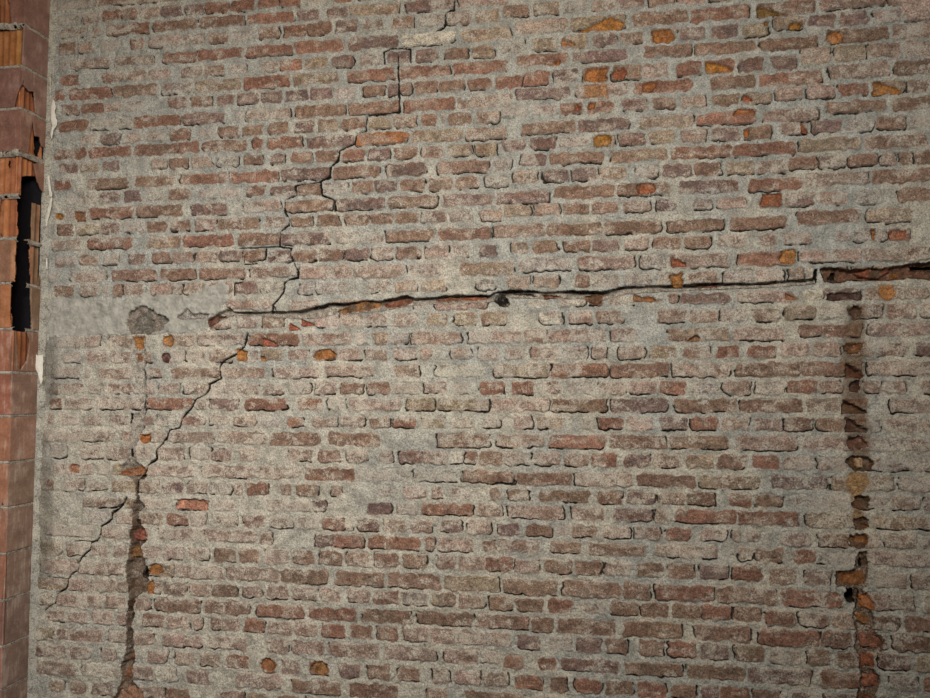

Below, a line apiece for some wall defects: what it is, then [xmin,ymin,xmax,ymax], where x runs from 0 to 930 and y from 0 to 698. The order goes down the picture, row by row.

peeling [49,72,57,139]
crack [234,1,455,315]
crack [44,333,249,624]
spalling [127,306,227,363]